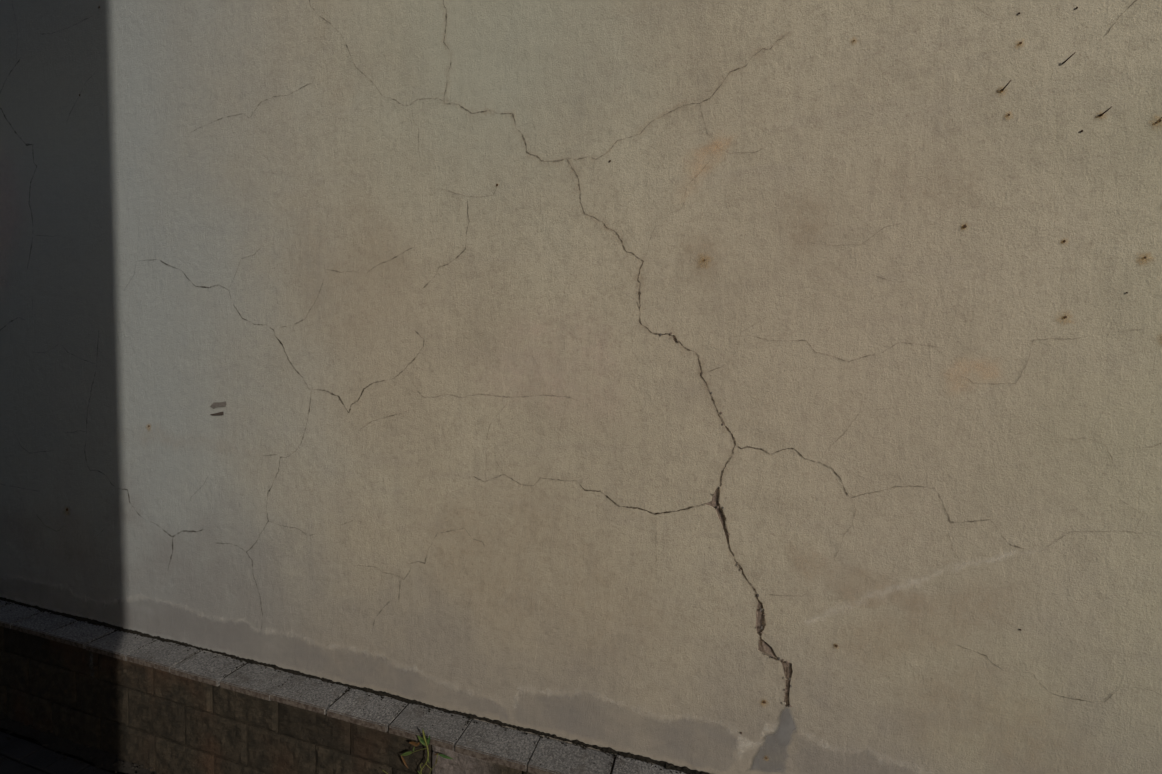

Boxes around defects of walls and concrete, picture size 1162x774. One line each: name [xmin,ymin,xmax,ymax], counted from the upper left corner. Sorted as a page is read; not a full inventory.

crack [558,141,805,707]
leakage [752,709,796,772]